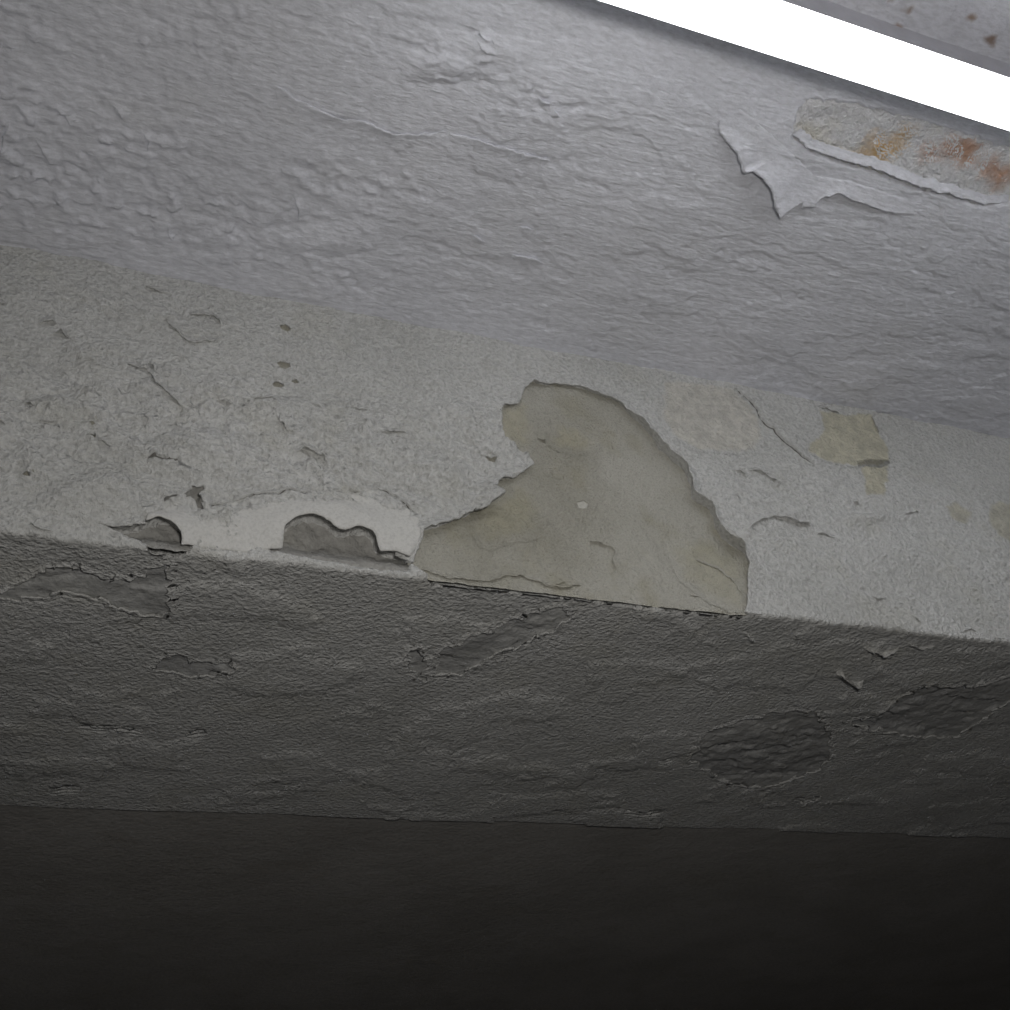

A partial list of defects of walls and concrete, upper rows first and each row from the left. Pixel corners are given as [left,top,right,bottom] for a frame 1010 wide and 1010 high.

spalling [718,98,1010,218]
rust [843,117,1010,196]
crack [735,388,814,466]
spalling [0,373,764,681]